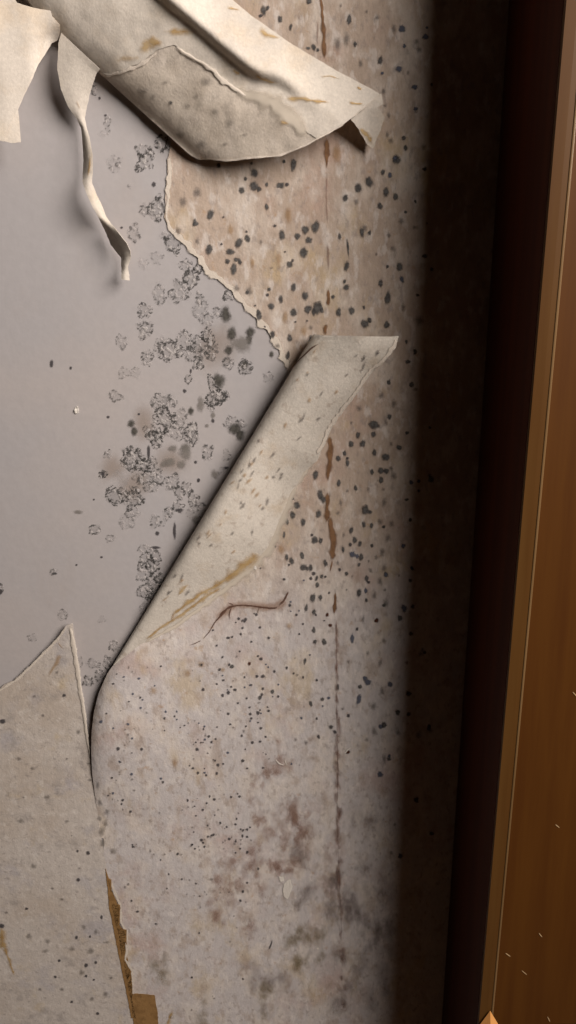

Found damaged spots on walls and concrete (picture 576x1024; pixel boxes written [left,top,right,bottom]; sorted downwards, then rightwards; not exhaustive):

water stain [135,134,171,172]
water stain [239,162,289,193]
water stain [343,136,407,209]
water stain [121,182,165,243]
water stain [274,221,320,267]
water stain [93,230,390,608]
peeling [105,868,158,1024]